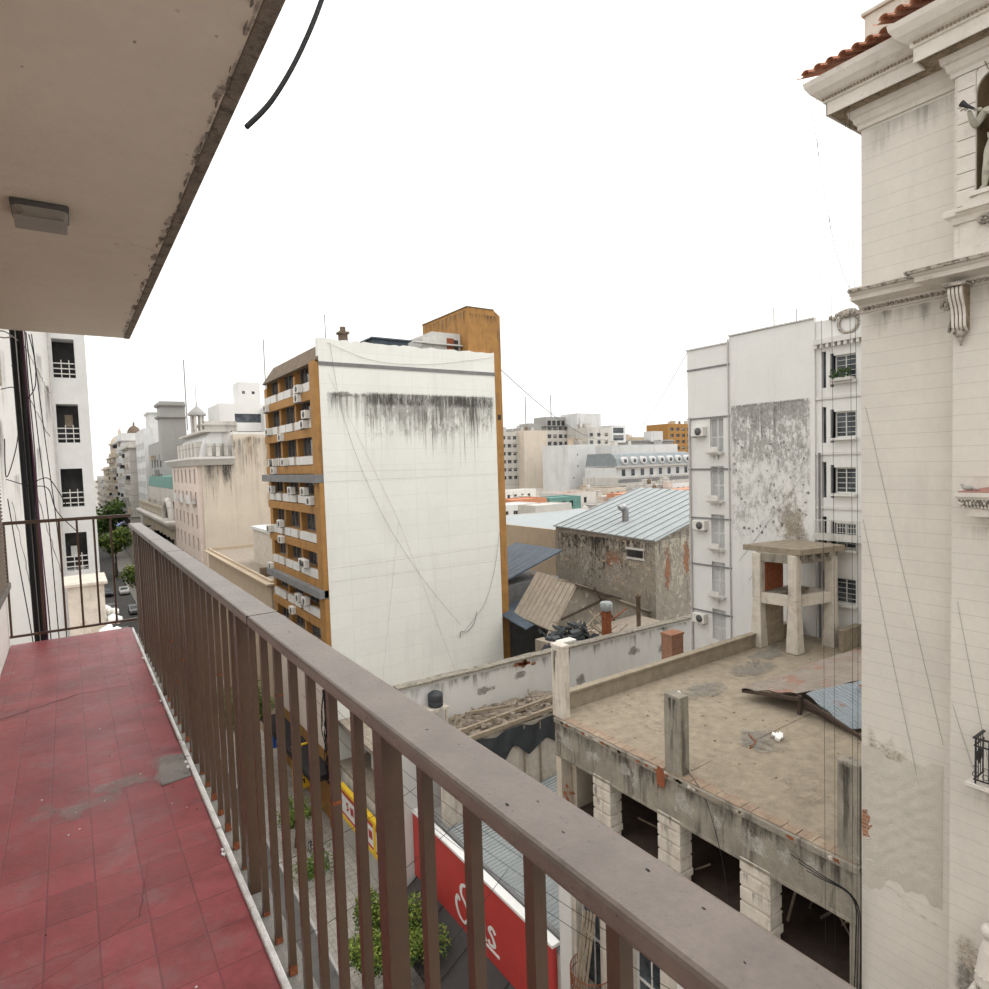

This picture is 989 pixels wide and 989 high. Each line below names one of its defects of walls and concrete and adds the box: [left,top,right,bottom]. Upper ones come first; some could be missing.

water stain [732,398,809,520]
flaking render [558,532,691,602]
spalling [862,809,872,837]